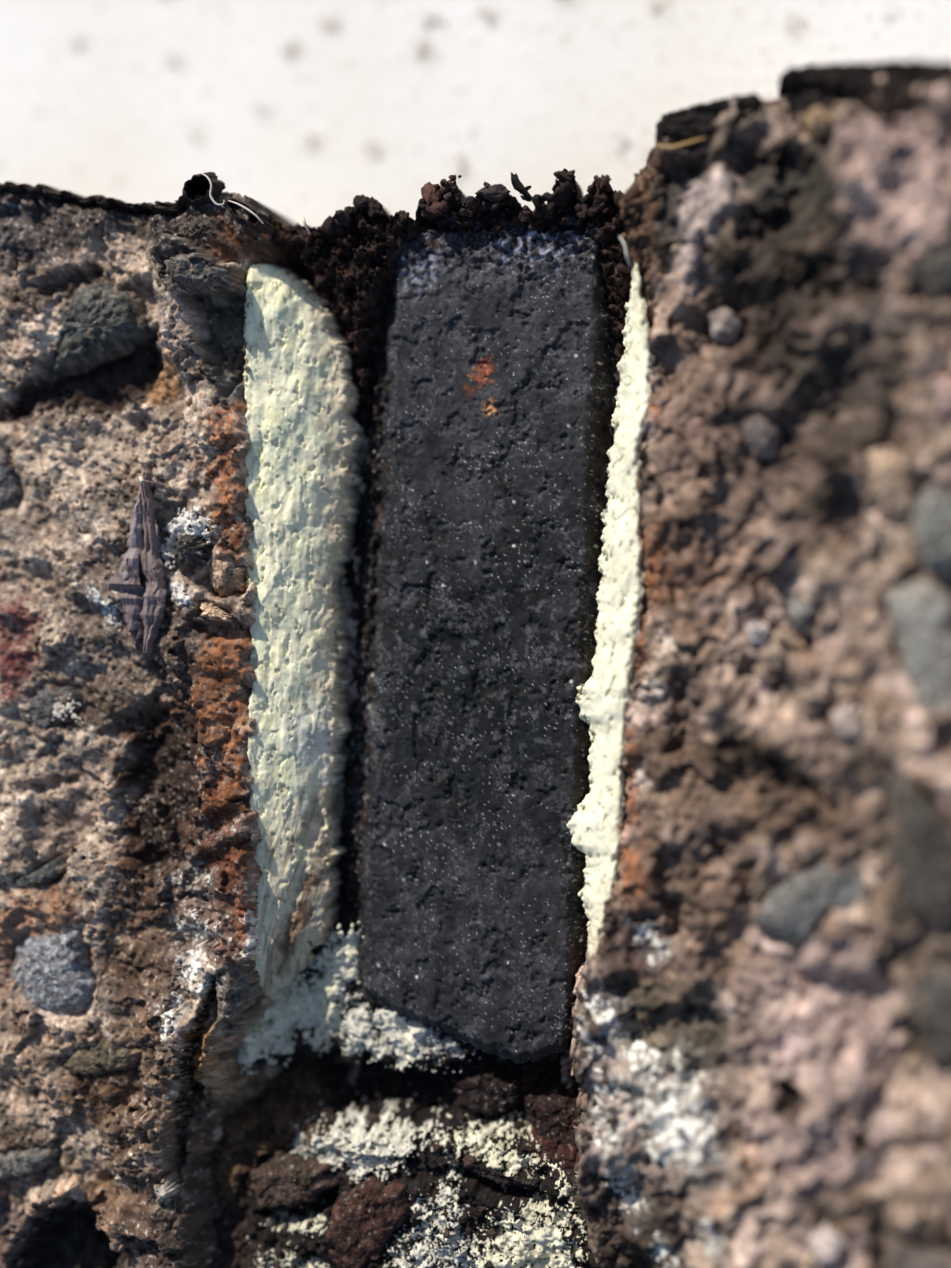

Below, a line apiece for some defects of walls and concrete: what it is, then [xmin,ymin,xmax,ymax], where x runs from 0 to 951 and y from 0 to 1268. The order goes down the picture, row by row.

rust [210,168,633,428]
rust [209,402,246,565]
rust [192,632,252,940]
efflorescence [624,914,671,965]
crack [174,980,217,1167]
efflorescence [570,980,725,1215]
efflorescence [646,1231,690,1267]